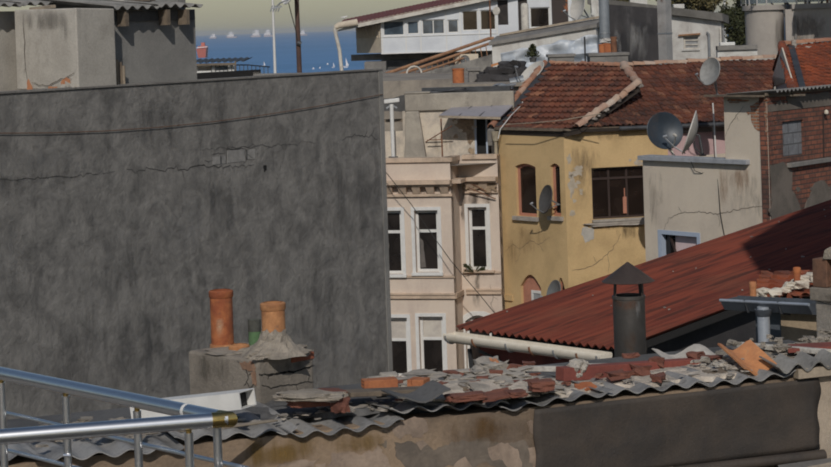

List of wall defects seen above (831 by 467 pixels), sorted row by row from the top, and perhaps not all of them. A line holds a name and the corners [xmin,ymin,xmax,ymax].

flaking render [48,77,75,88]
spalling [727,97,782,162]
crack [7,141,305,182]
crack [664,206,762,229]
crack [245,365,314,390]
flaking render [277,416,536,467]